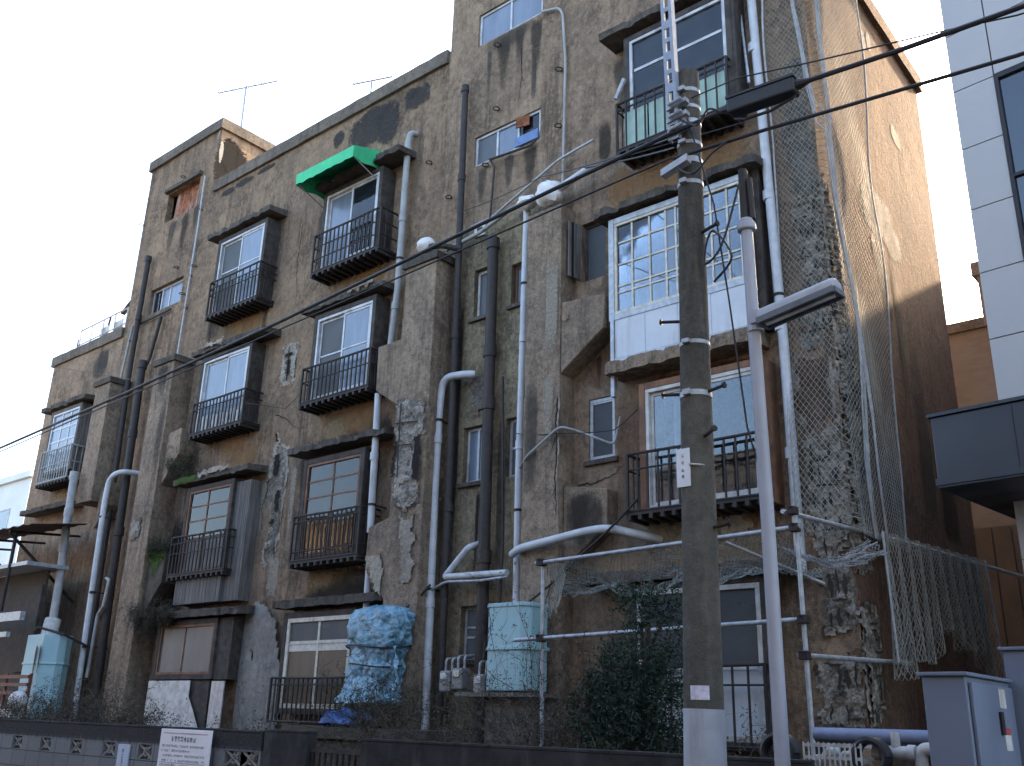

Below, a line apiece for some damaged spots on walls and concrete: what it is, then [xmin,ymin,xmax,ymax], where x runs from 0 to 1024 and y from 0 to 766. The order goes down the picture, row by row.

leakage [488,21,542,94]
spalling [279,341,300,386]
spalling [781,50,886,729]
spalling [261,441,290,567]
spalling [390,398,428,583]
crack [549,398,624,515]